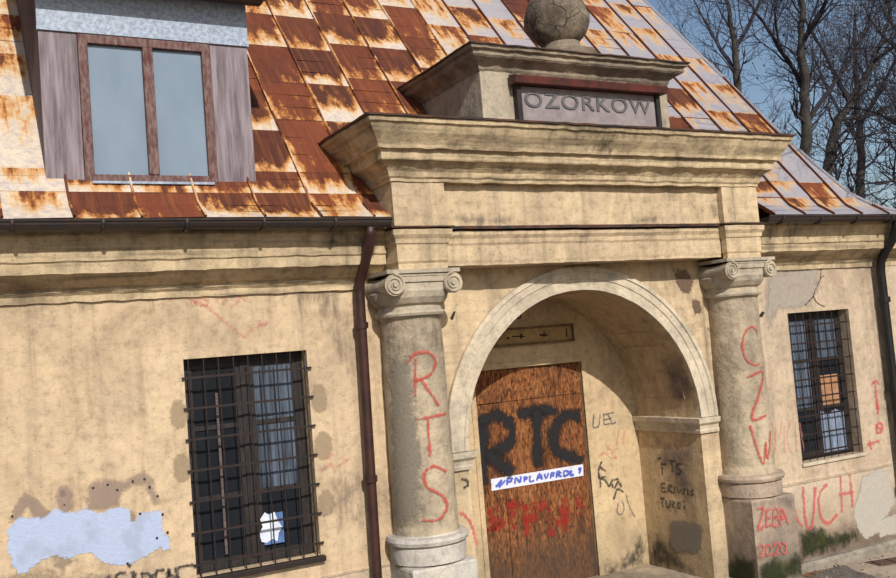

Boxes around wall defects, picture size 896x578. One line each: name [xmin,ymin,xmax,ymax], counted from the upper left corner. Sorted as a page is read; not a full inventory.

peeling [6,504,170,574]